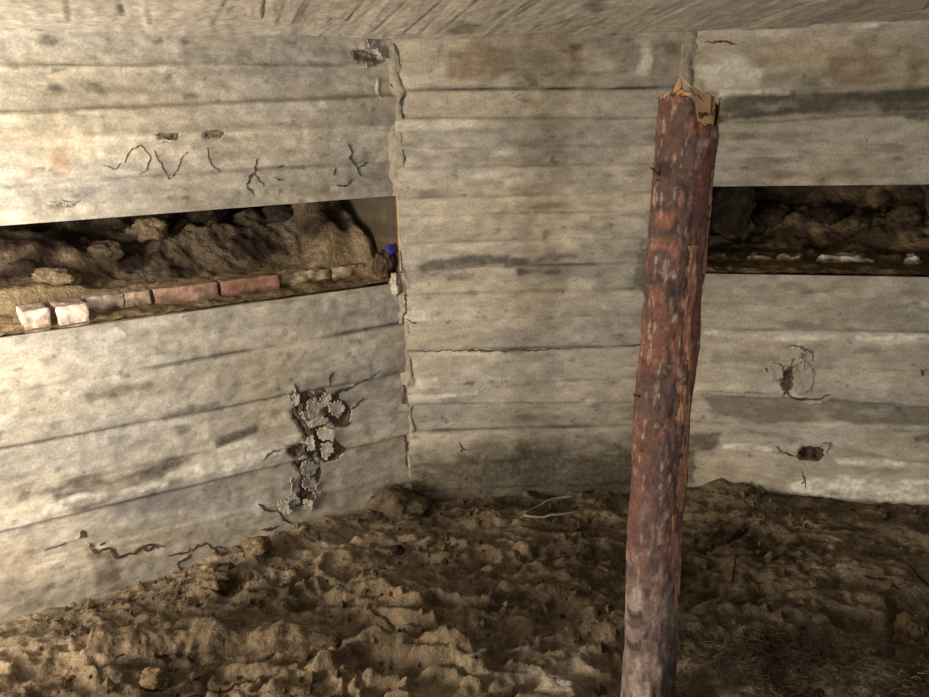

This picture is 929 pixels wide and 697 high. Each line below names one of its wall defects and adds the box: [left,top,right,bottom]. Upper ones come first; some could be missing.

crack [257,0,265,19]
spalling [351,38,388,69]
water stain [697,56,929,122]
crack [103,145,220,180]
crack [246,159,284,195]
crack [334,143,366,187]
spalling [261,371,380,515]
peeling [669,345,929,608]
crack [44,530,226,571]